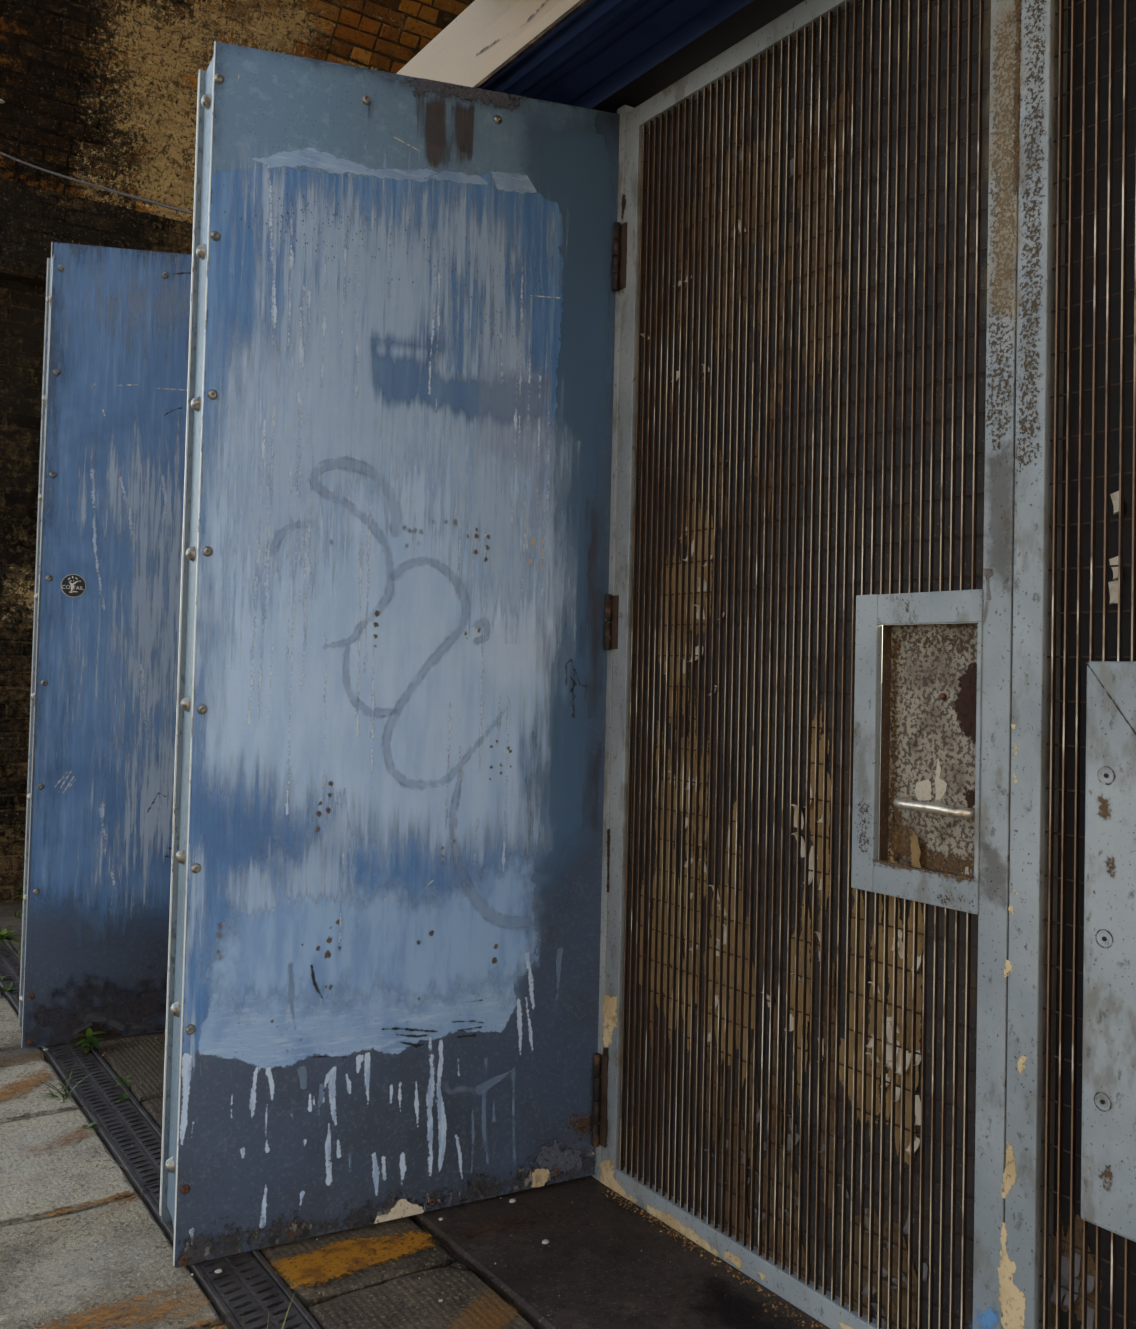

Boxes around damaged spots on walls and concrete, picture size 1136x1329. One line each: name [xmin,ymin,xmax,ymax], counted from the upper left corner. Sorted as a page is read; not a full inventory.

leakage [75,0,335,224]
corrosion [1012,0,1022,195]
peeling [1110,491,1119,515]
peeling [1108,556,1118,604]
corrosion [872,626,977,883]
spalling [374,1199,424,1223]
peeling [1000,1139,1017,1199]
peeling [997,1222,1026,1329]
peeling [1050,1214,1103,1329]